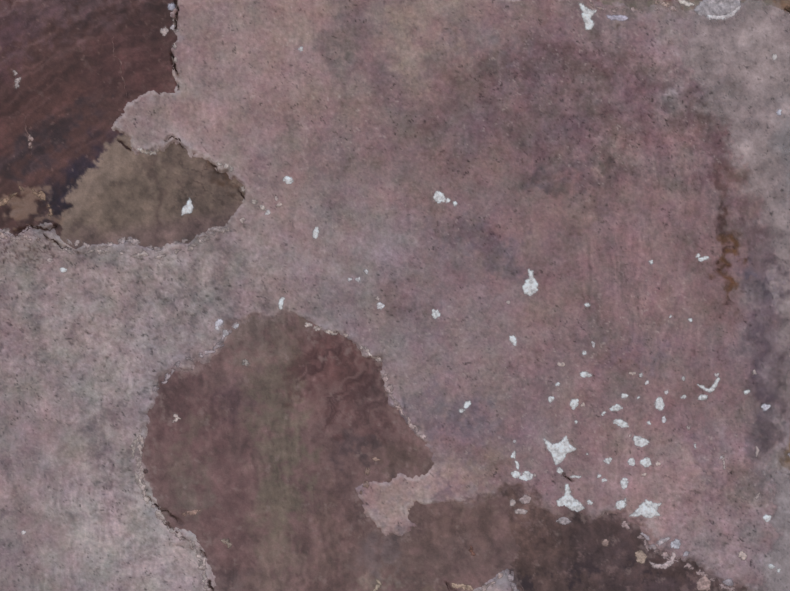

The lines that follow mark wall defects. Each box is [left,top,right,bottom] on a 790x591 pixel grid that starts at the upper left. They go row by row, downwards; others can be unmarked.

spalling [0,0,282,259]
spalling [590,0,790,21]
spalling [131,312,747,591]